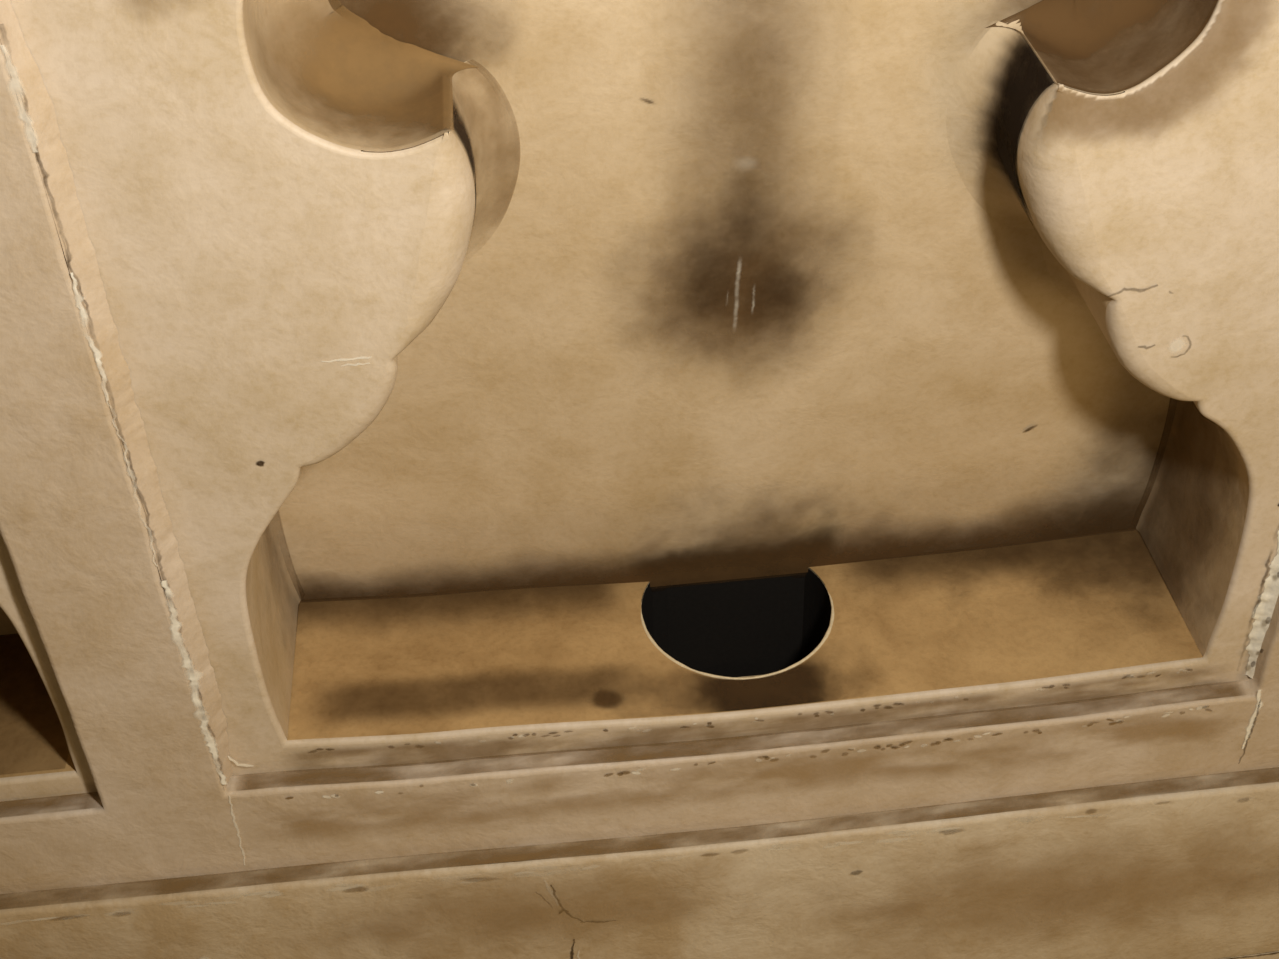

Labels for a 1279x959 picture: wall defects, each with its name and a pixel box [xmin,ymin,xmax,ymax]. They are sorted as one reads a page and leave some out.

crack [0,0,253,865]
crack [1242,530,1279,749]
crack [551,885,616,959]